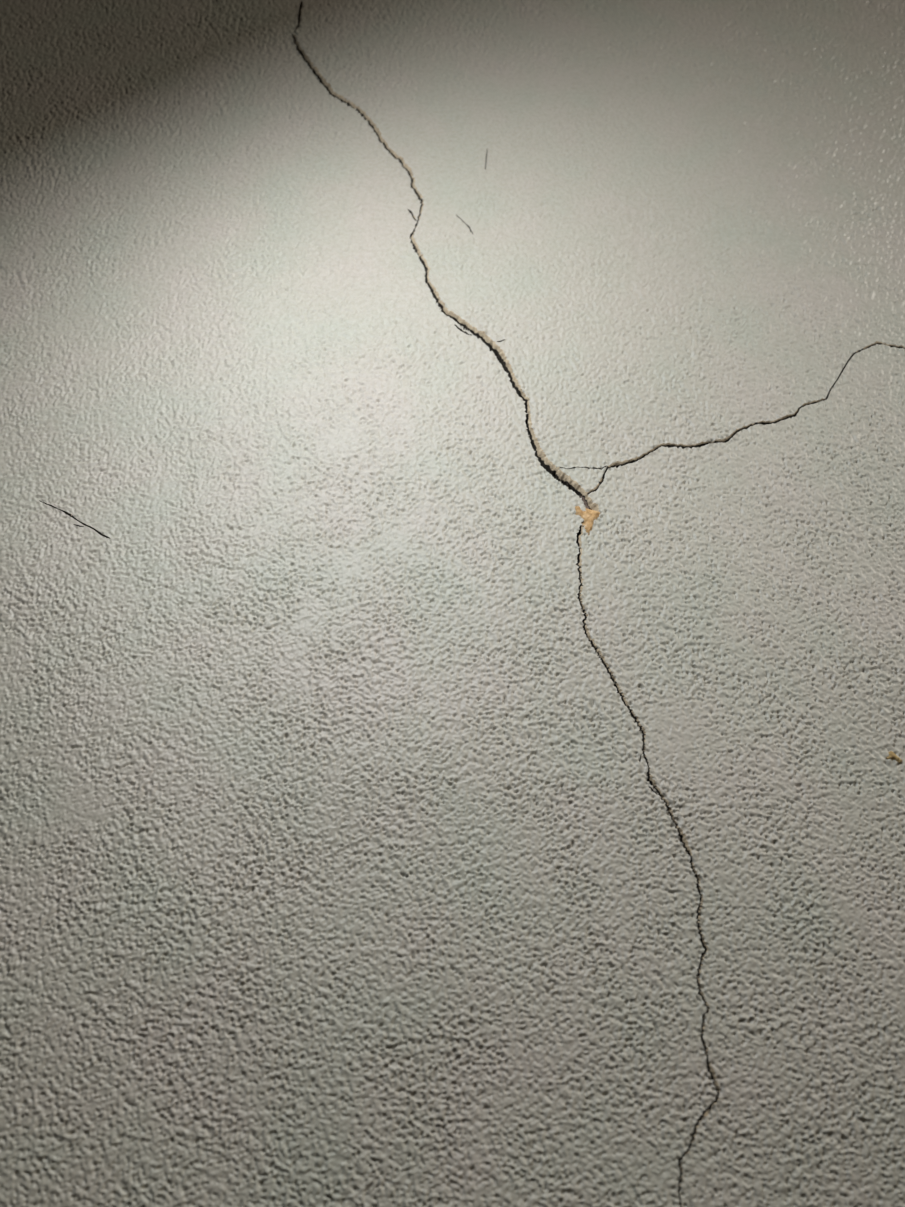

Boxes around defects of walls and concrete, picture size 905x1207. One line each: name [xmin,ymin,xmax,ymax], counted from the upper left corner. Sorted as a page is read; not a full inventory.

crack [292,1,905,1207]